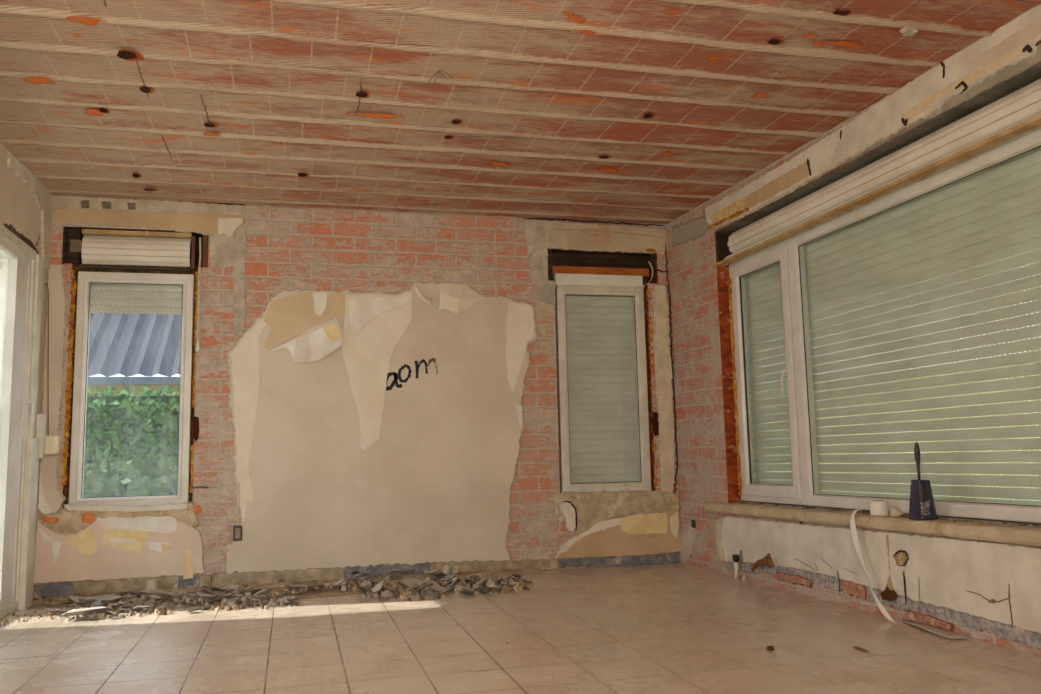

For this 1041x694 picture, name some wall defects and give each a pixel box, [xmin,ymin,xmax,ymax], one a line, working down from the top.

spalling [66,17,104,26]
flaking render [705,4,1041,229]
peeling [506,302,535,431]
peeling [231,292,410,522]
spalling [38,465,202,563]
spalling [555,490,680,553]
flaking render [775,572,813,588]
flaking render [841,580,867,600]
spalling [893,550,909,566]
flaking render [904,610,955,631]
crack [966,584,1013,628]